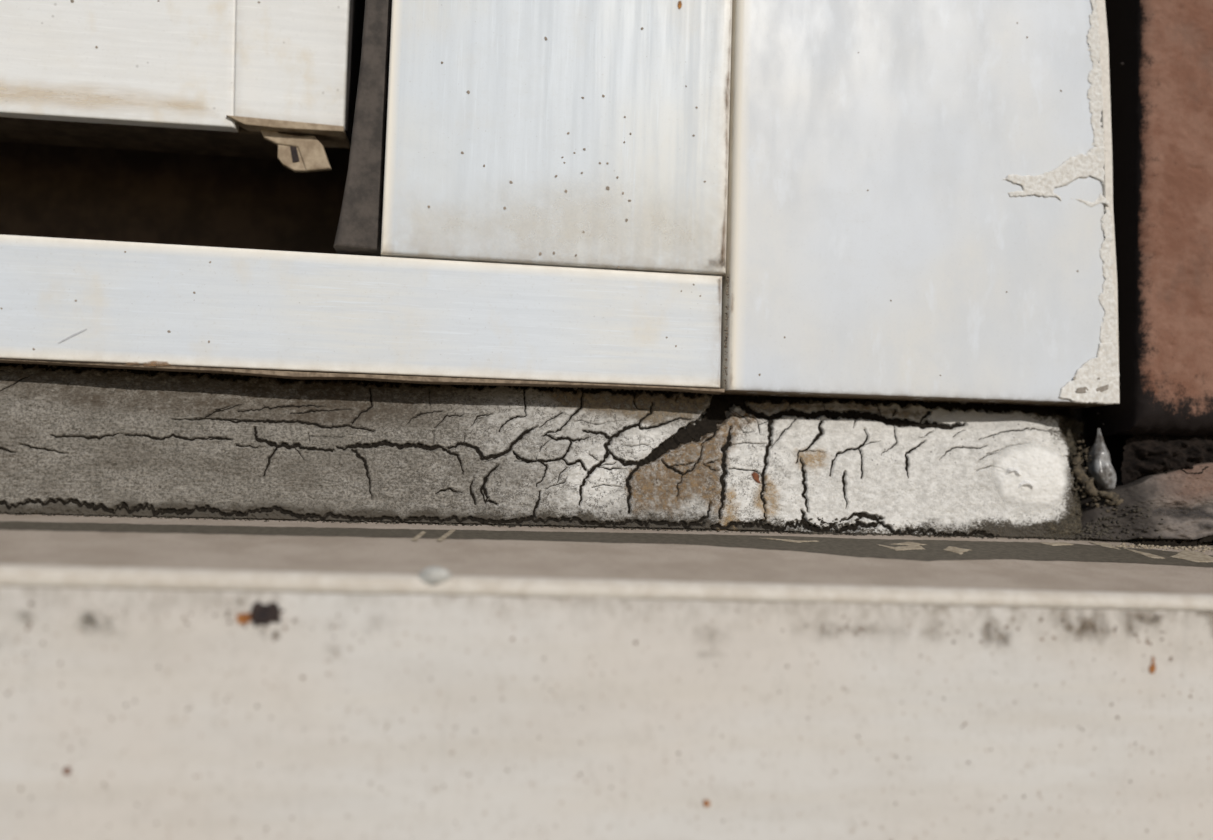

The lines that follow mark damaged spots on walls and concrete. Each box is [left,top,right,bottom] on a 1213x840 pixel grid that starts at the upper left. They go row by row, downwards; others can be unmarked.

peeling [1003,0,1120,404]
crack [0,363,1071,538]
corrosion [236,612,252,624]